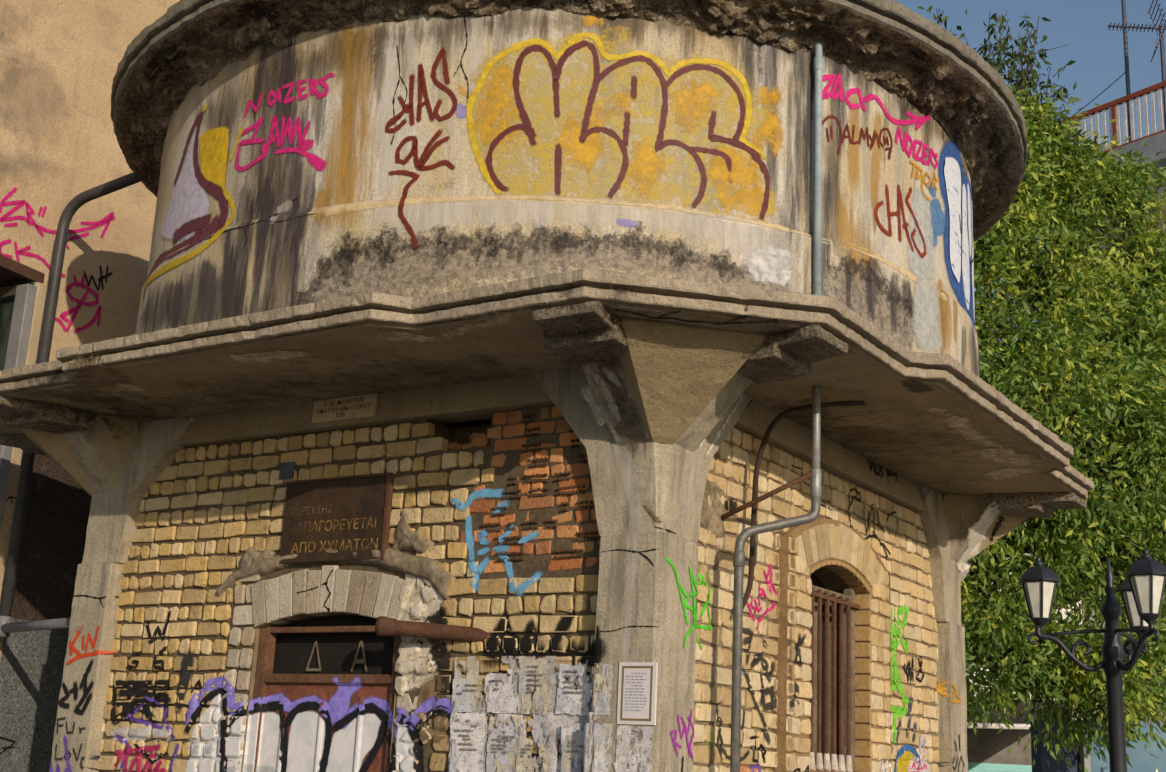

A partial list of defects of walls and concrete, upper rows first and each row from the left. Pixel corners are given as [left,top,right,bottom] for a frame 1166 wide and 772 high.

spalling [145,0,279,81]
crack [391,44,408,145]
crack [454,16,469,109]
leakage [141,15,789,333]
spalling [426,419,492,452]
flaking render [956,502,1006,581]